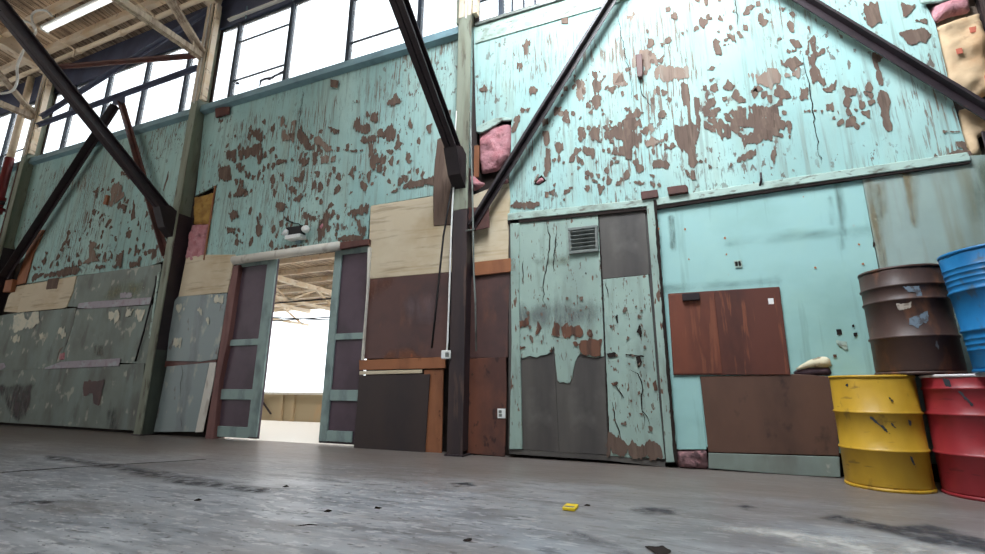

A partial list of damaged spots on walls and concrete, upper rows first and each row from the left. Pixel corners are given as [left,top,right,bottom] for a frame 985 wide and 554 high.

peeling [899,2,932,45]
peeling [387,92,401,107]
peeling [218,111,434,250]
peeling [31,171,159,282]
peeling [11,311,46,343]
peeling [108,292,145,324]
peeling [519,295,646,367]
peeling [83,379,104,406]
peeling [606,380,663,461]